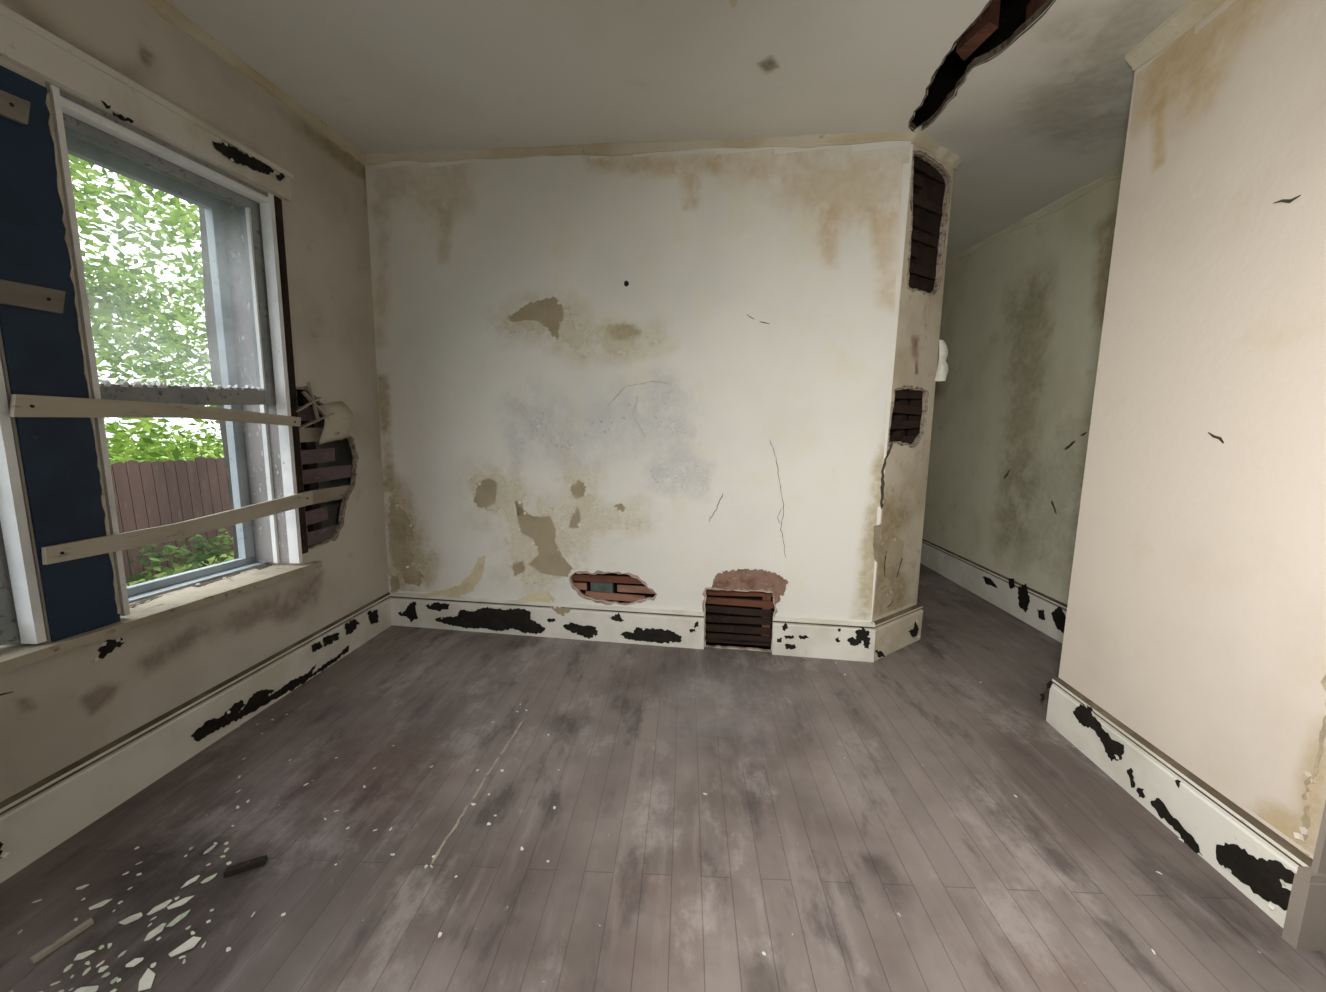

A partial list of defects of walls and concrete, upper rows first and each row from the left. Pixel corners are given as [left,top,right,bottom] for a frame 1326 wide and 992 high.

spalling [45,94,92,399]
spalling [907,150,952,296]
peeling [509,297,564,340]
spalling [296,382,359,549]
spalling [94,637,124,663]
peeling [193,564,272,587]
spalling [191,609,379,742]
spalling [388,478,809,652]
spalling [982,576,1066,633]
crack [1312,674,1326,778]
spalling [1073,703,1295,911]
peeling [1293,771,1315,858]